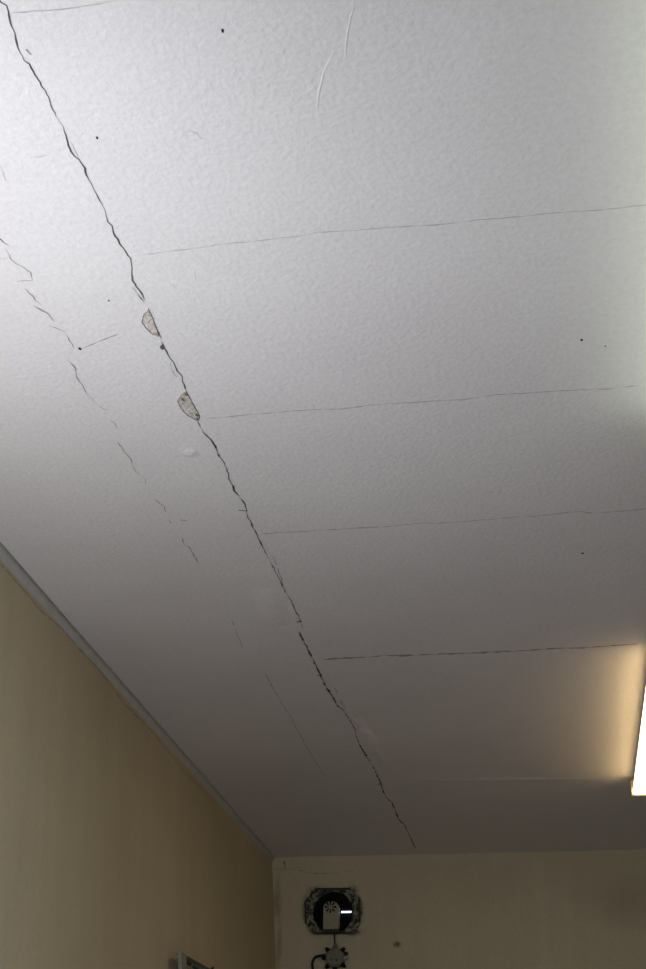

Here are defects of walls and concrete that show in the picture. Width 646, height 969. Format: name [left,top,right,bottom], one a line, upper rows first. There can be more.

crack [0,0,644,313]
crack [0,239,198,563]
flaking render [141,309,164,350]
flaking render [177,391,199,421]
crack [157,330,646,847]